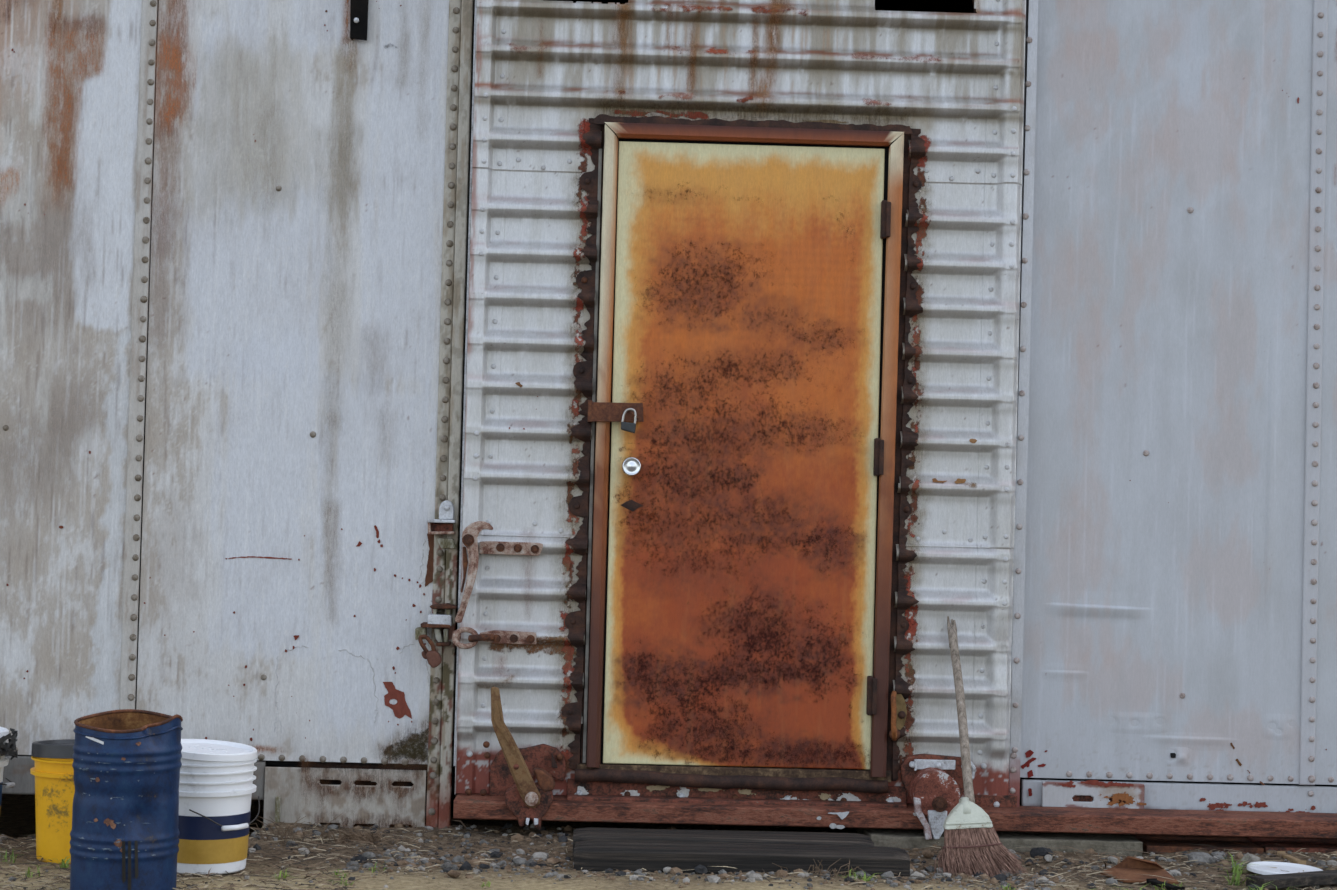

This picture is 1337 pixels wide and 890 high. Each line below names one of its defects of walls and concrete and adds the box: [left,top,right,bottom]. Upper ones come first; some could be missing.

corrosion [48,0,100,184]
corrosion [659,35,728,99]
corrosion [737,0,806,105]
corrosion [615,365,849,574]
peeling [383,666,412,725]
corrosion [628,597,847,763]
peeling [1200,798,1316,813]